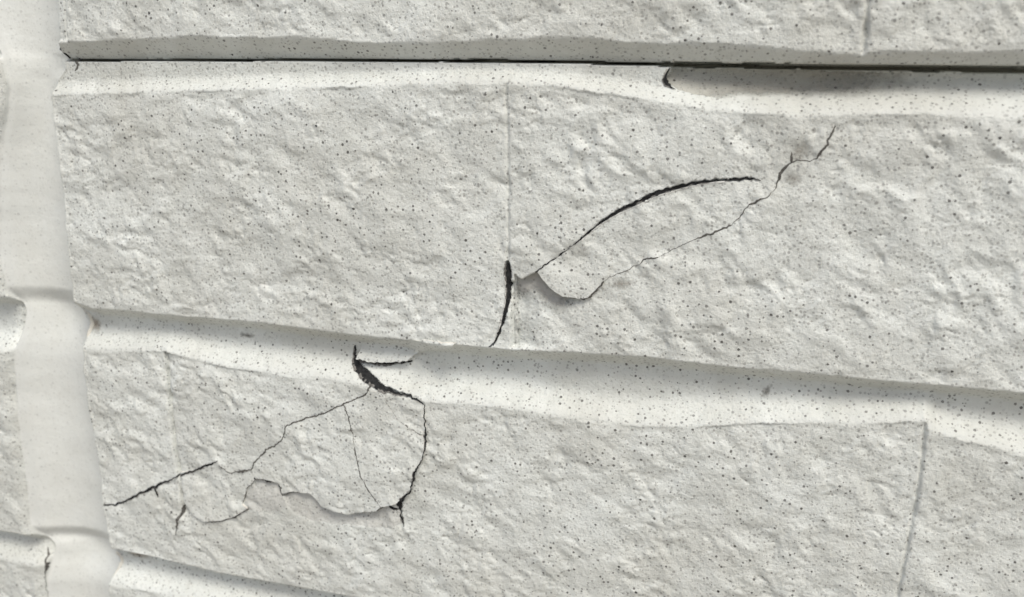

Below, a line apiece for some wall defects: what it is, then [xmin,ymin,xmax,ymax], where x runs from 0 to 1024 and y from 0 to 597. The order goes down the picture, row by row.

crack [489,126,836,347]
crack [175,504,186,536]
crack [103,345,427,527]